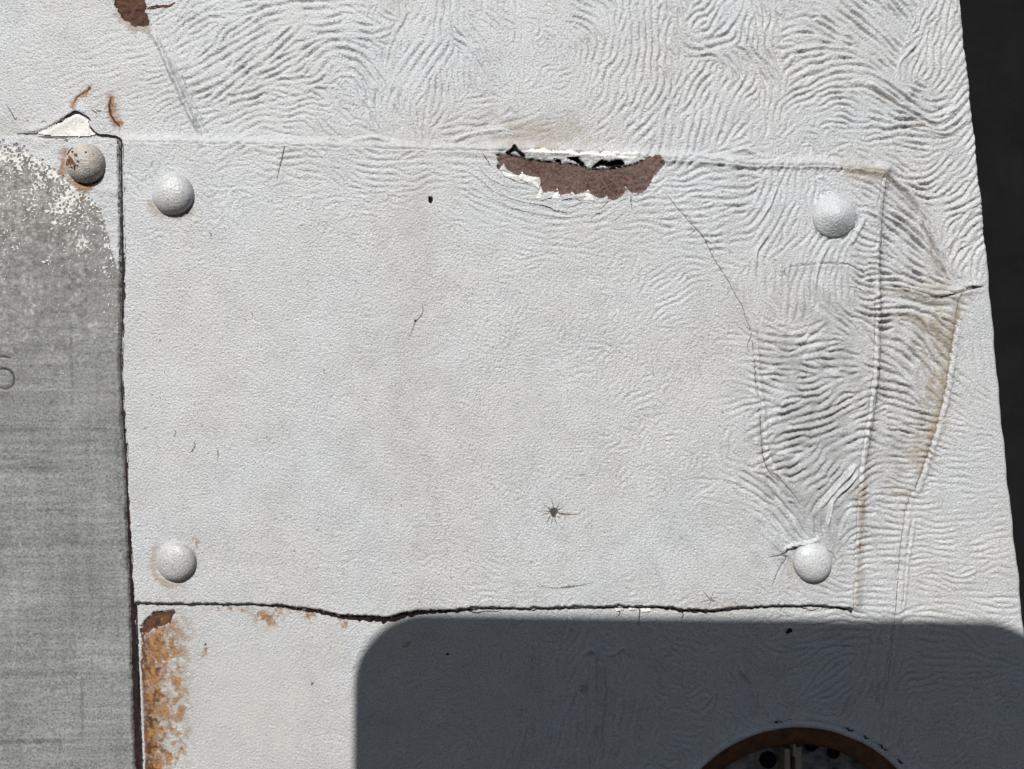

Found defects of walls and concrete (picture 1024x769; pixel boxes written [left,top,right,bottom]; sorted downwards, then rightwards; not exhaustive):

peeling [114,0,175,27]
peeling [0,105,124,375]
rust [108,95,123,127]
peeling [477,144,665,221]
crack [120,140,852,769]
rust [139,622,185,769]